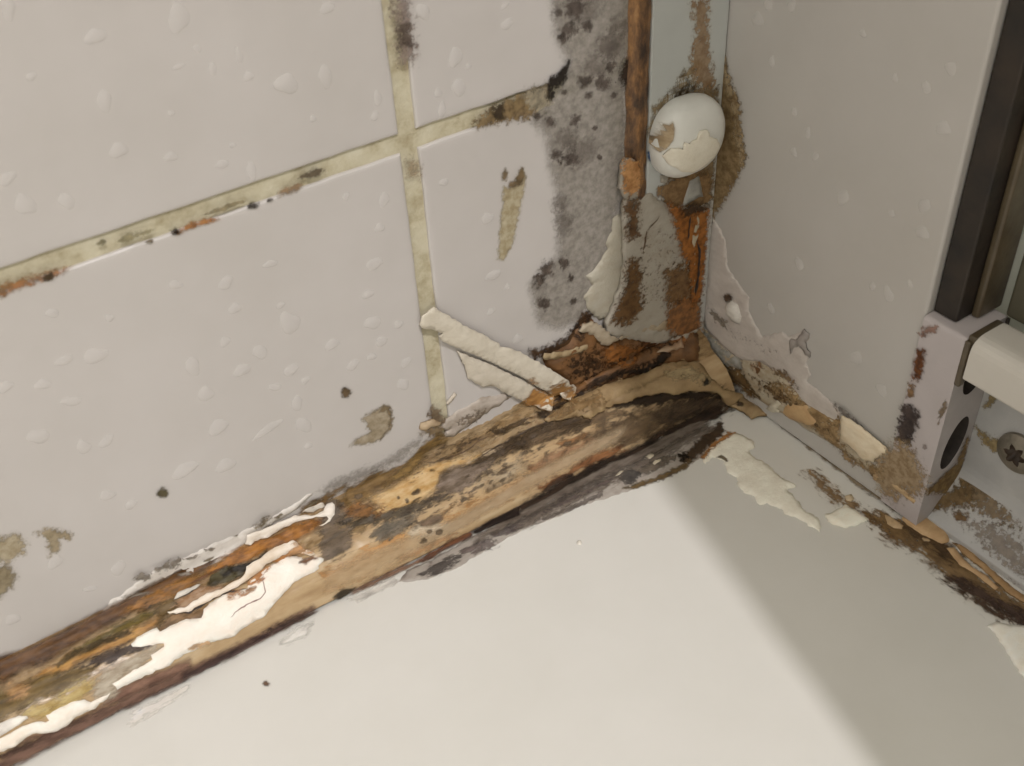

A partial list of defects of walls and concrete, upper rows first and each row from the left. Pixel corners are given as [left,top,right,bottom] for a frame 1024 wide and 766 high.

leakage [388,0,419,66]
leakage [0,267,67,297]
leakage [97,229,153,245]
leakage [171,168,326,235]
leakage [471,0,628,360]
peeling [419,157,887,462]
peeling [700,432,868,532]
peeling [0,483,346,752]